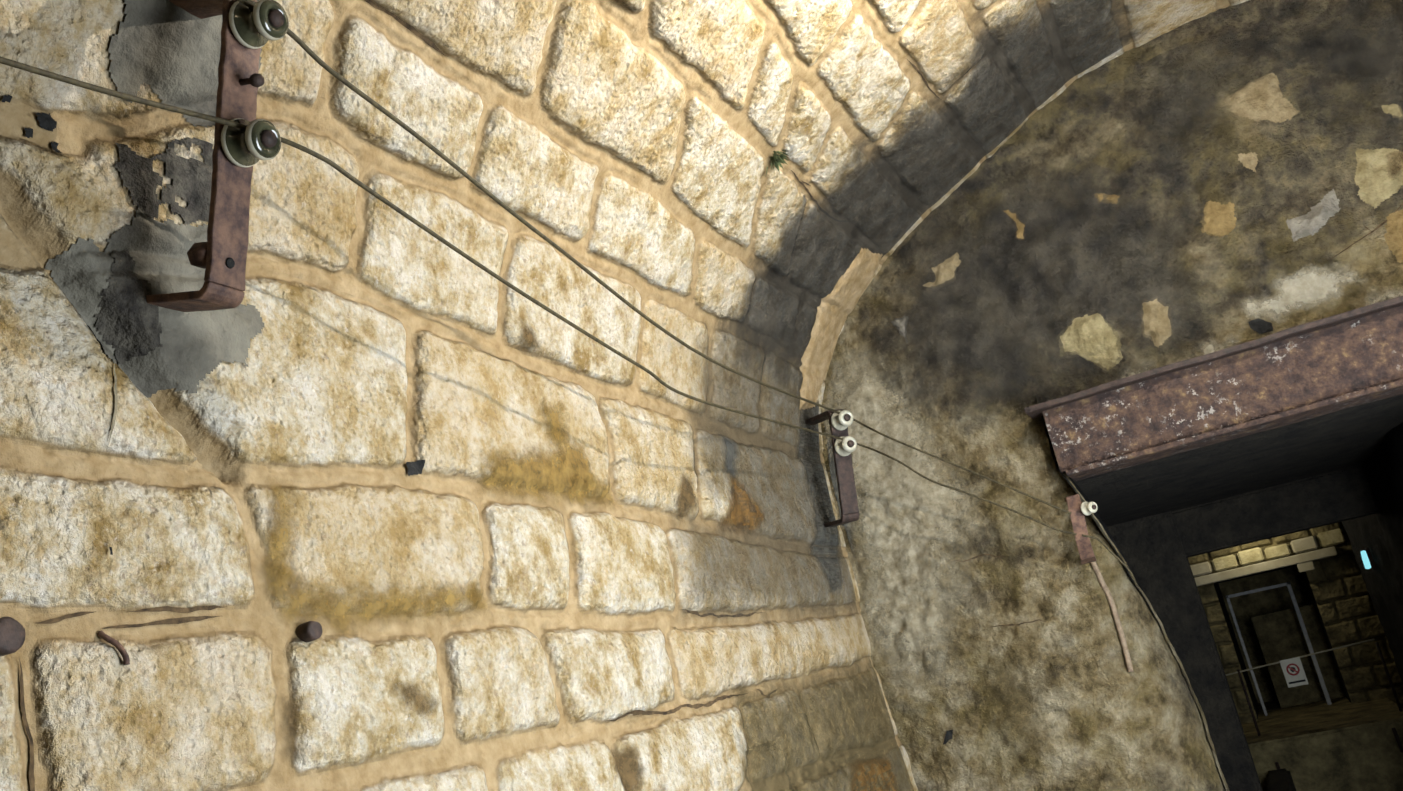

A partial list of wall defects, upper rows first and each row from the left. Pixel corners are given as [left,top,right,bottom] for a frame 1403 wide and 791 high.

water stain [1146,34,1282,163]
spalling [1224,73,1300,123]
spalling [1200,200,1237,237]
spalling [1286,189,1341,242]
spalling [1354,147,1403,263]
peeling [923,252,961,287]
water stain [1246,268,1352,319]
spalling [1060,313,1123,373]
spalling [1141,299,1172,348]
water stain [1202,339,1235,355]
water stain [798,360,969,670]
water stain [737,660,914,791]